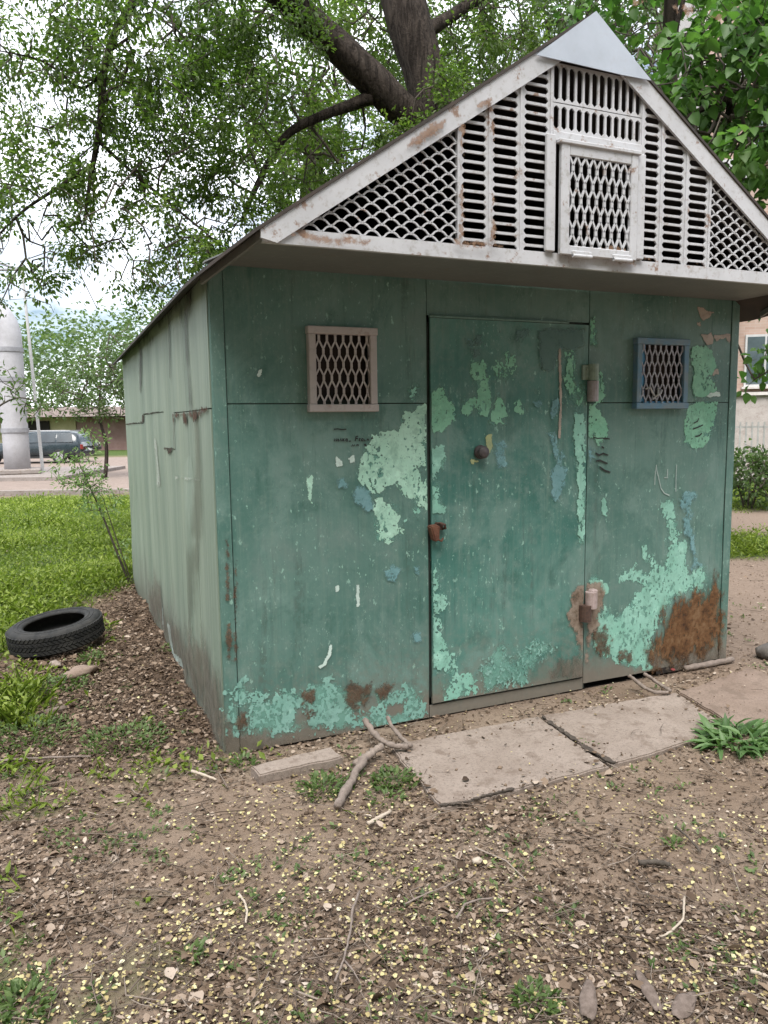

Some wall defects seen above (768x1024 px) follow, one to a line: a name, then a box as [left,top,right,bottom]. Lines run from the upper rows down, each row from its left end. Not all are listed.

rust [454,185,500,248]
peeling [684,307,731,449]
rust [164,407,207,454]
peeling [336,351,526,545]
peeling [563,350,609,543]
peeling [433,567,558,701]
rust [567,582,633,663]
peeling [589,499,707,671]
rust [646,575,726,675]
rust [302,689,315,720]
peeling [219,674,428,738]
rust [344,680,394,710]